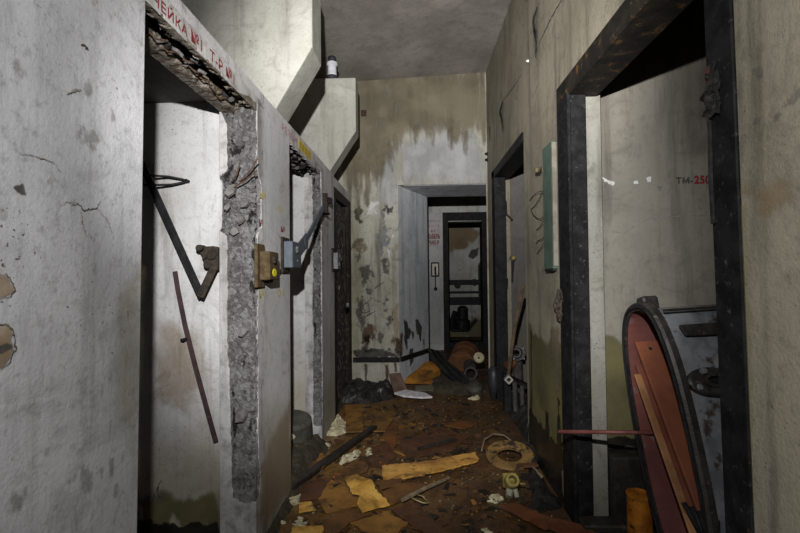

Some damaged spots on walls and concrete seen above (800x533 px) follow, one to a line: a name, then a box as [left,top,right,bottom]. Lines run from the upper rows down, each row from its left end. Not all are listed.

water stain [345,72,486,223]
crack [59,201,114,239]
peeling [0,273,16,299]
spalling [145,0,266,533]
spalling [289,134,325,440]
peeling [0,324,17,369]
peeling [404,319,425,366]
water stain [528,324,563,470]
water stain [137,493,220,533]